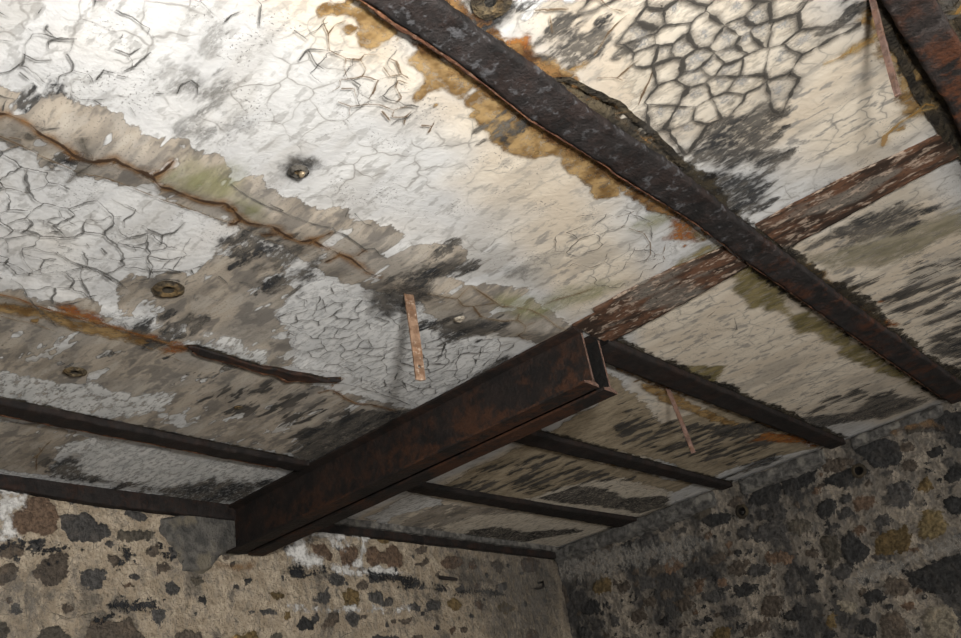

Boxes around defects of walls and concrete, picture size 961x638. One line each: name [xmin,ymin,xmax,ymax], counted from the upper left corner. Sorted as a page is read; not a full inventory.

crack [0,0,382,363]
crack [294,17,434,133]
water stain [472,109,530,145]
corrosion [317,0,711,247]
water stain [530,13,647,69]
crack [535,0,877,156]
corrosion [842,0,925,132]
corrosion [0,303,314,383]
peeling [0,228,504,459]
water stain [217,224,320,297]
water stain [371,237,481,317]
crack [278,210,666,411]